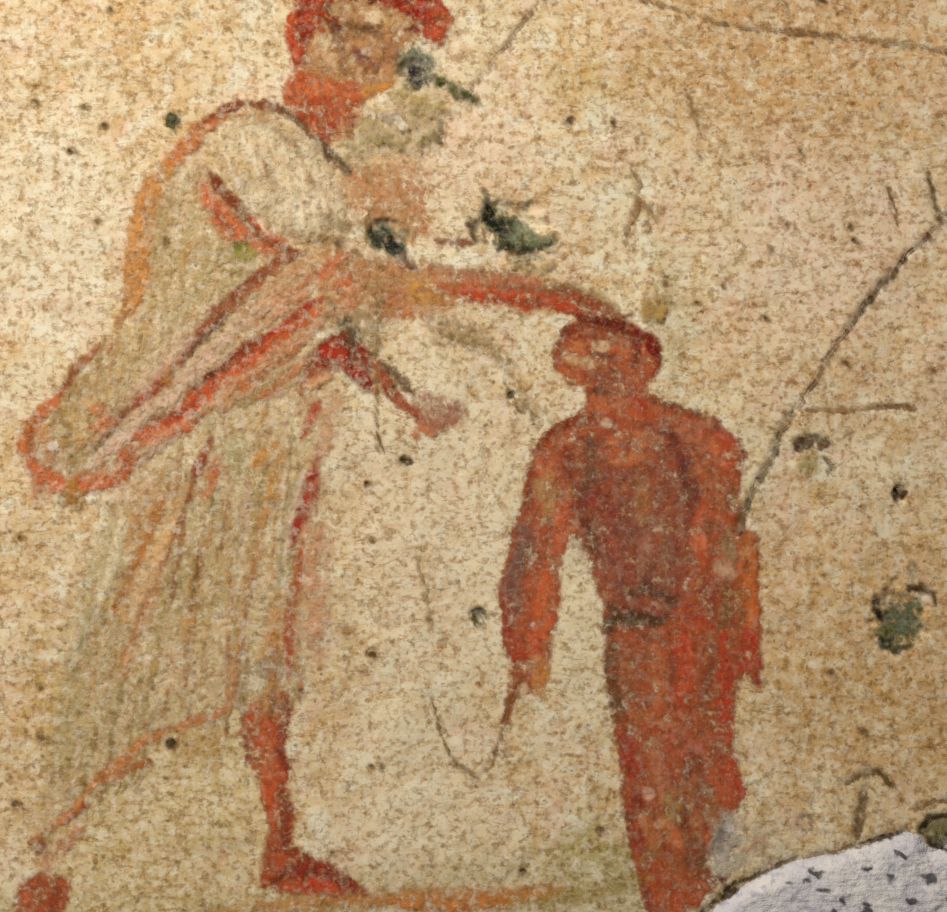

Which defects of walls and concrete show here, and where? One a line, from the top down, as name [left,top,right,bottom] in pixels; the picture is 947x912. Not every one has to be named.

crack [477,7,536,81]
crack [639,0,947,54]
crack [737,171,947,533]
damp [871,582,936,654]
flaking render [710,813,767,875]
flaking render [916,817,947,851]
spalling [803,869,828,892]
spalling [921,873,937,884]